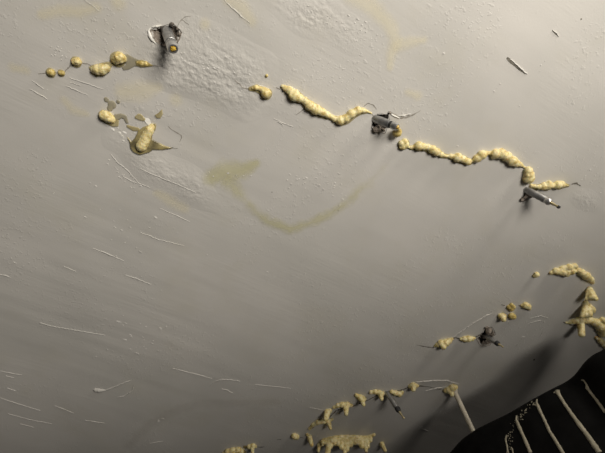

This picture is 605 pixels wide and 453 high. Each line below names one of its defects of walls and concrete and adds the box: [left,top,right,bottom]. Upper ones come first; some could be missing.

crack [364,103,421,119]